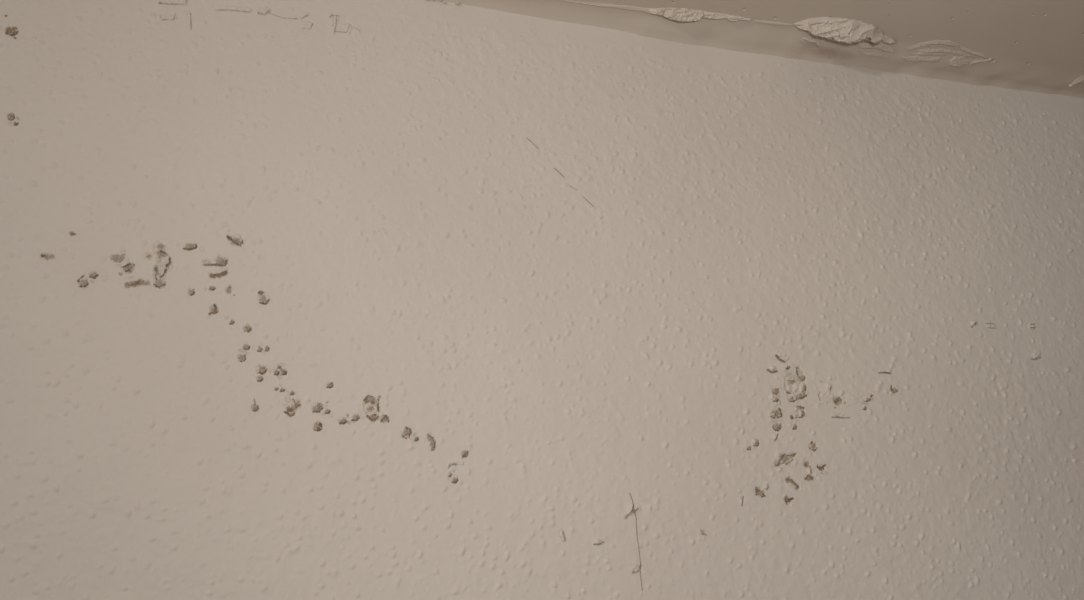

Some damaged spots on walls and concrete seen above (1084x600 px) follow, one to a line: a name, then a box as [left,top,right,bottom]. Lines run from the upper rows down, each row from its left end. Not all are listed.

flaking render [0,15,24,42]
flaking render [793,16,897,58]
flaking render [72,230,473,488]
flaking render [825,382,846,410]
flaking render [742,361,830,508]